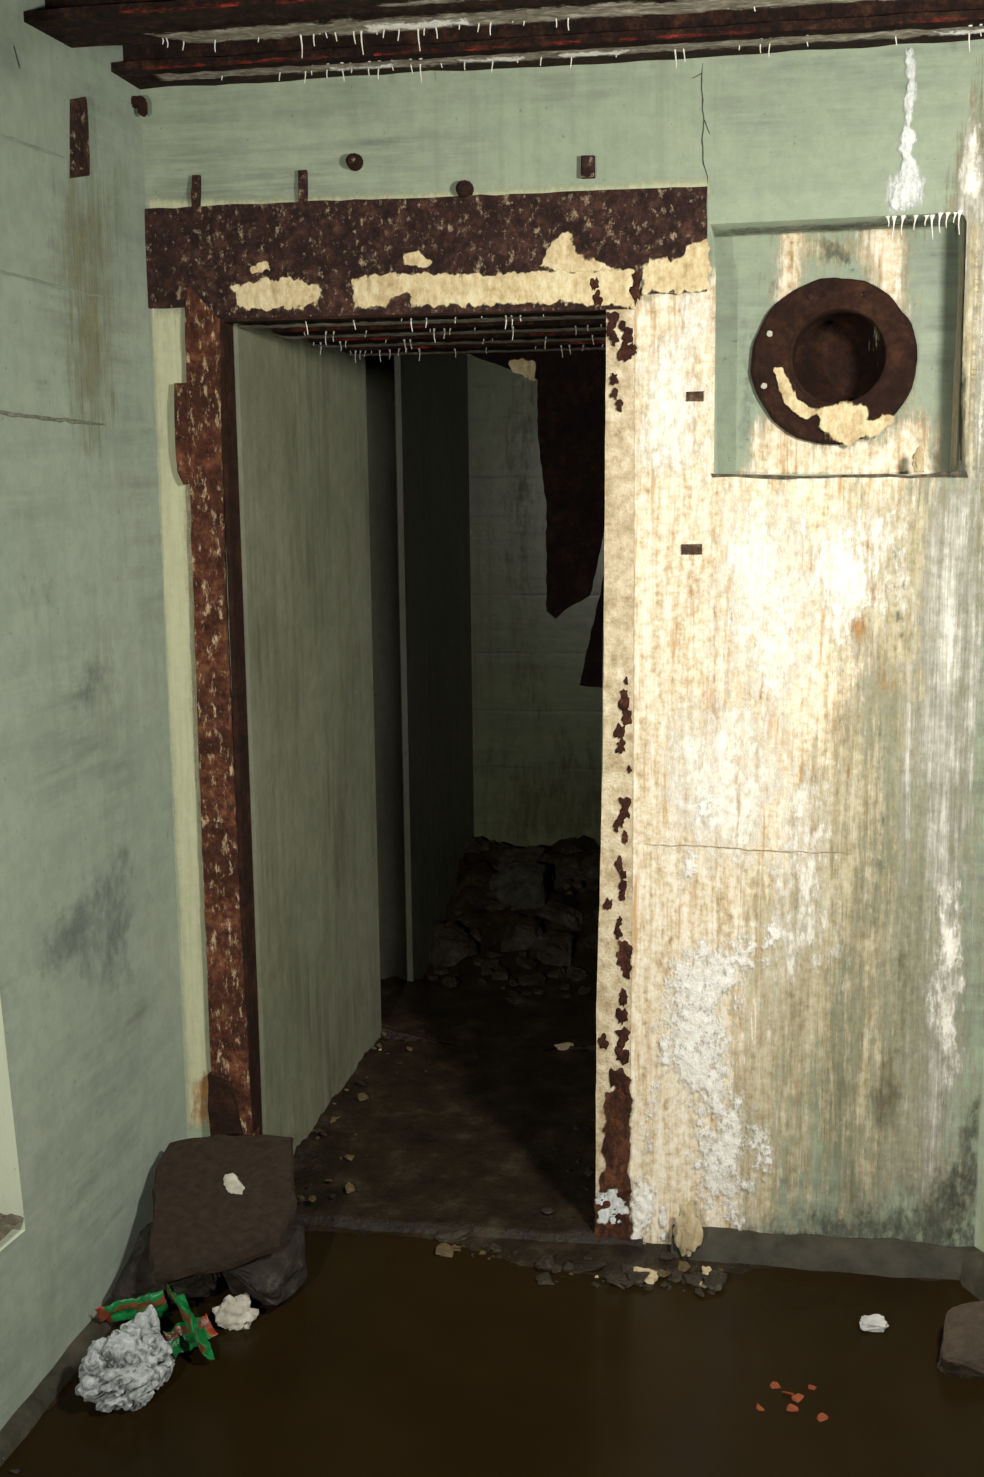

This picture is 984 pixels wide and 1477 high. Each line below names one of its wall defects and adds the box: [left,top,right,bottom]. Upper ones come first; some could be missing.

peeling [230,261,322,312]
peeling [351,232,712,309]
rust [629,272,640,301]
rust [590,278,637,412]
crack [0,410,105,425]
water stain [595,89,984,1247]
rust [613,676,632,773]
rust [594,797,633,1241]
rust [194,1072,209,1120]